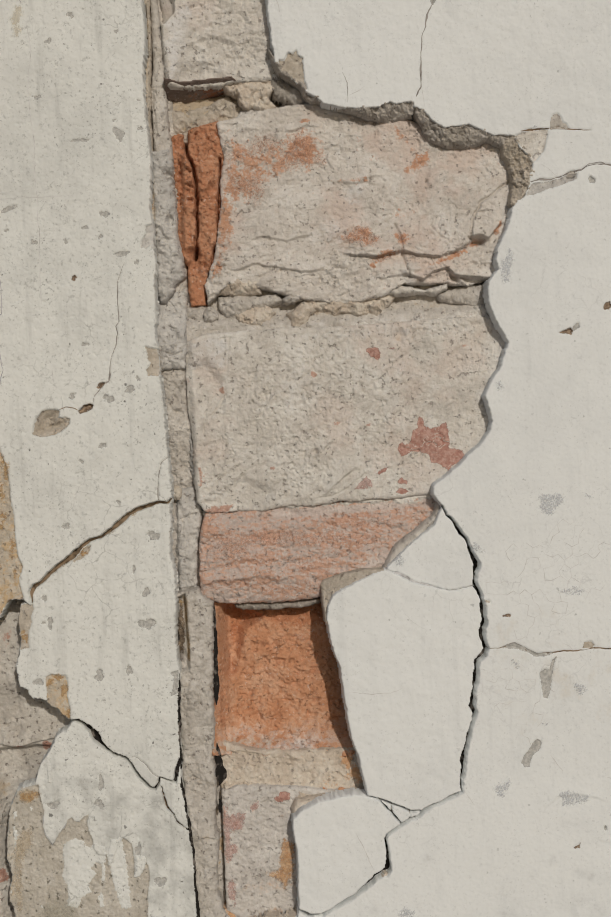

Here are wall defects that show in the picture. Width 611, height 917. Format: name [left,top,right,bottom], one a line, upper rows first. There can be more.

spalling [267,48,577,208]
crack [530,162,611,182]
spalling [0,452,53,650]
crack [30,458,172,603]
spalling [320,501,442,624]
spalling [33,674,70,719]
peeling [7,751,167,917]
crack [76,674,200,917]
crack [357,836,390,886]
crack [386,515,611,803]
peeling [501,643,557,698]
peeling [521,739,541,767]